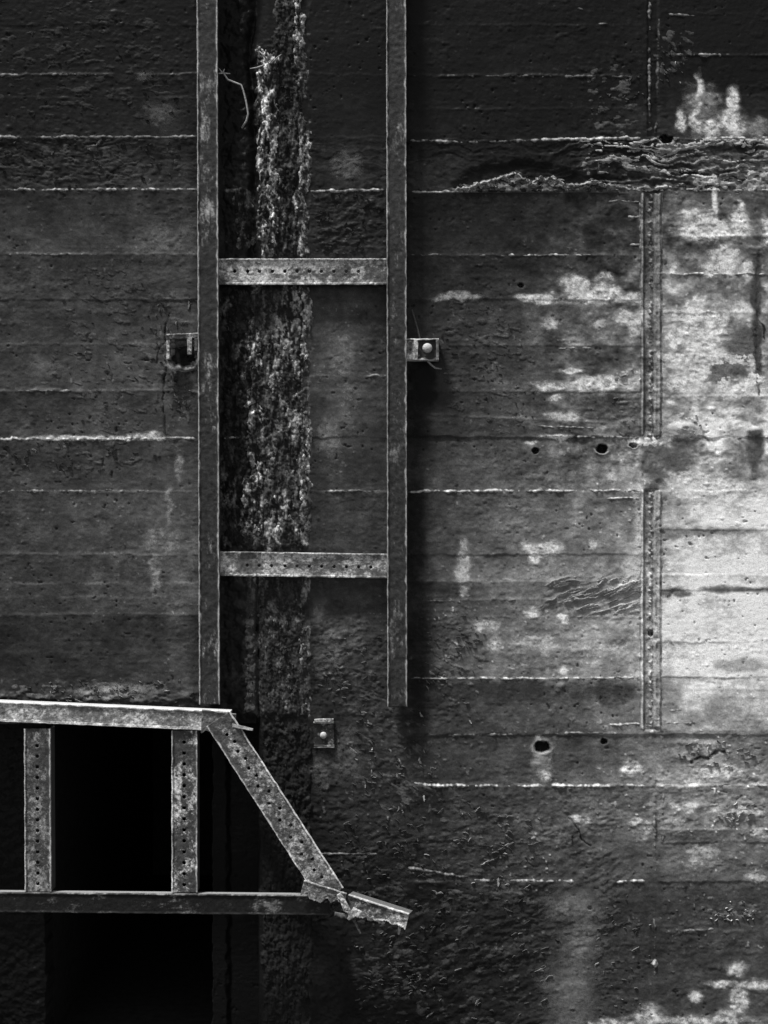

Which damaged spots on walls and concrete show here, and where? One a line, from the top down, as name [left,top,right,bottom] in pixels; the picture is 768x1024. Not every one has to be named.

spalling [452,64,768,193]
leakage [677,80,764,138]
leakage [518,272,653,337]
leakage [664,189,766,395]
crack [156,315,170,436]
leakage [536,368,623,420]
leakage [629,421,746,496]
leakage [747,432,763,478]
spalling [536,572,644,617]
leakage [660,588,691,597]
leakage [703,585,768,593]
leakage [548,892,768,1024]